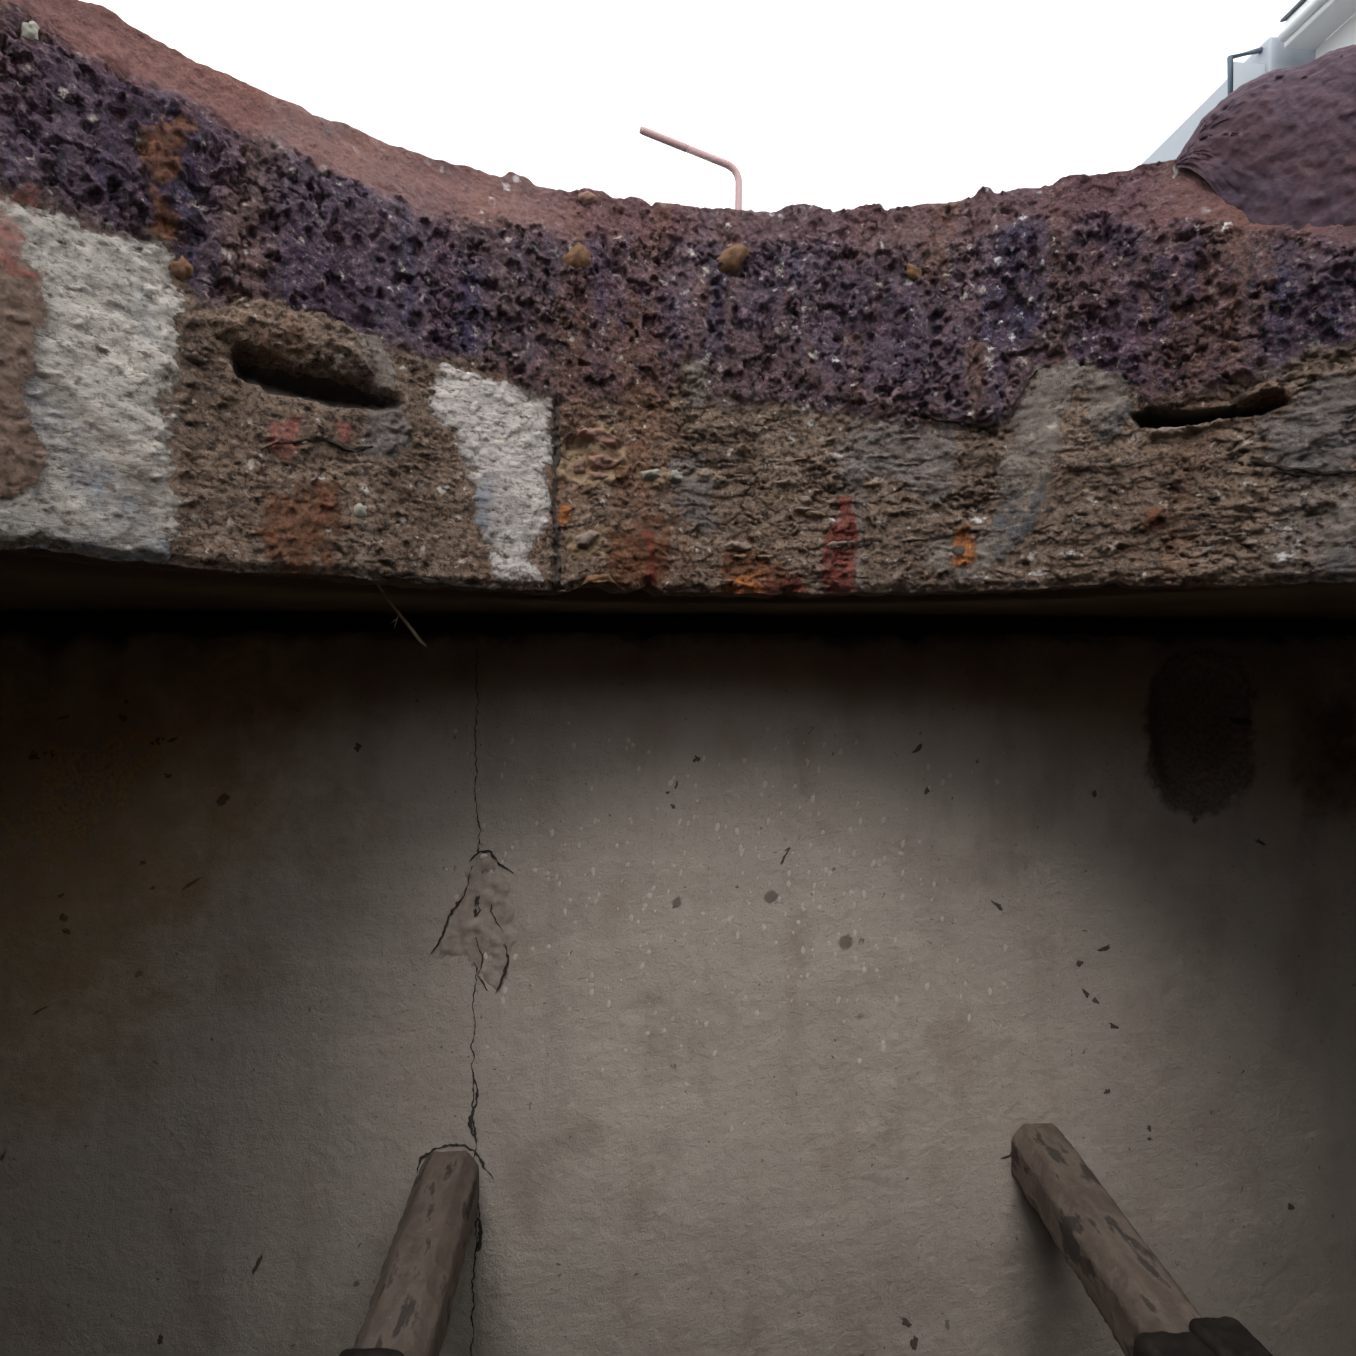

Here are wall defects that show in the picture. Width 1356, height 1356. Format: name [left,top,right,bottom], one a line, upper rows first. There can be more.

spalling [231,333,405,411]
crack [473,647,483,917]
crack [417,961,493,1356]